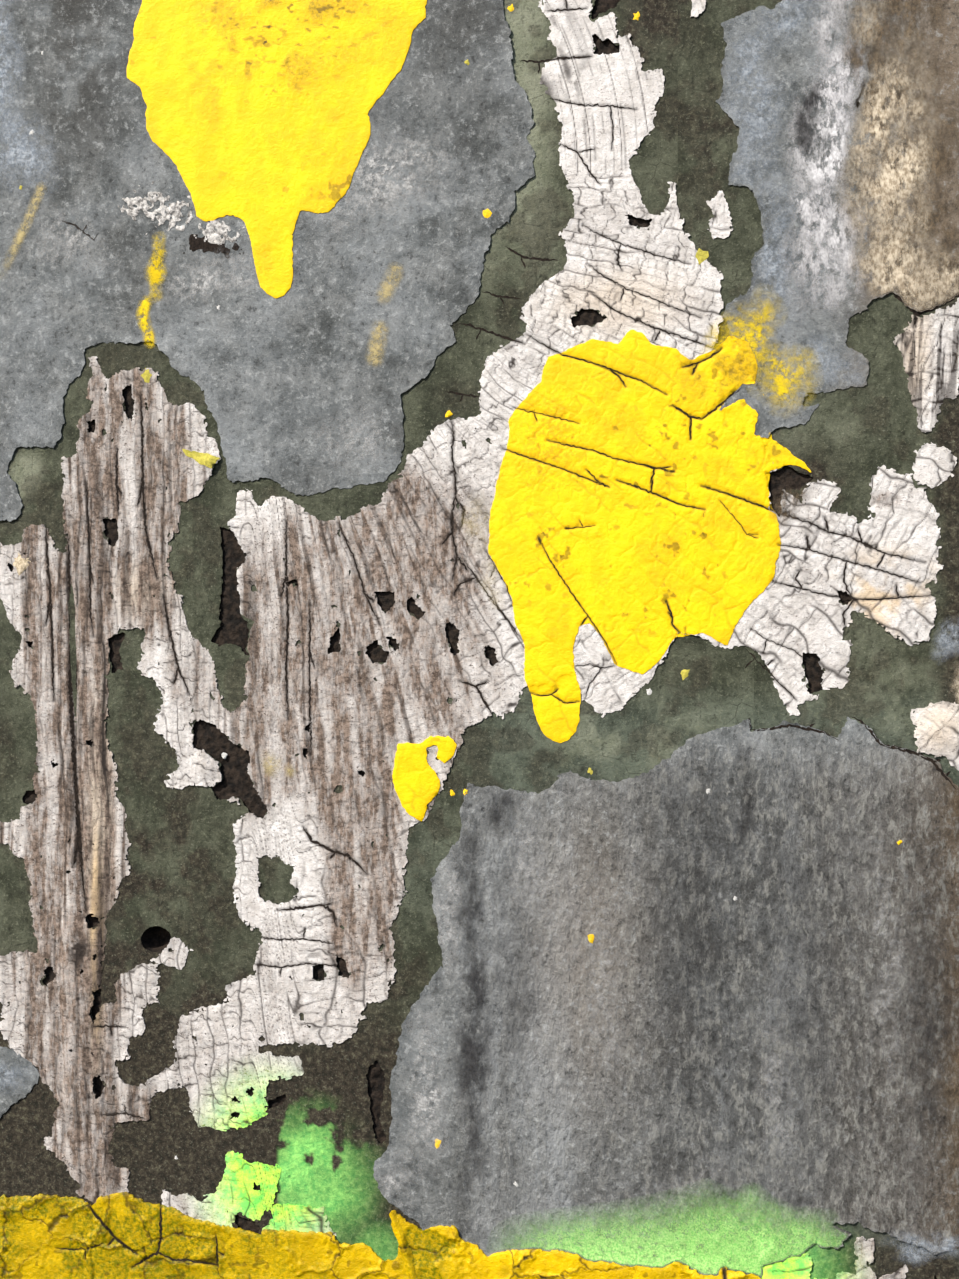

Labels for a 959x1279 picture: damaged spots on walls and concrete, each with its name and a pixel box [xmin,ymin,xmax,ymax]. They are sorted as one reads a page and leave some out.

crack [507,247,556,268]
peeling [401,0,782,442]
crack [460,291,742,439]
crack [583,225,721,374]
crack [502,407,930,625]
crack [530,521,616,704]
peeling [0,292,959,1261]
crack [59,1206,223,1267]